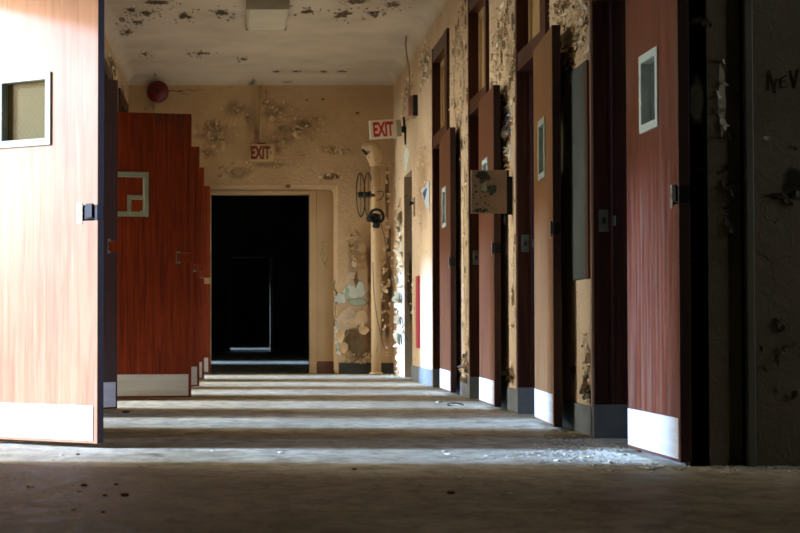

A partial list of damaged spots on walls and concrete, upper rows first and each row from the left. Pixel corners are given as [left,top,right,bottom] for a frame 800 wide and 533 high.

peeling [115,0,236,36]
peeling [290,0,411,24]
peeling [548,0,589,80]
peeling [489,0,515,172]
peeling [717,58,732,140]
peeling [448,0,497,384]
flaking render [334,226,371,364]
peeling [579,329,591,402]